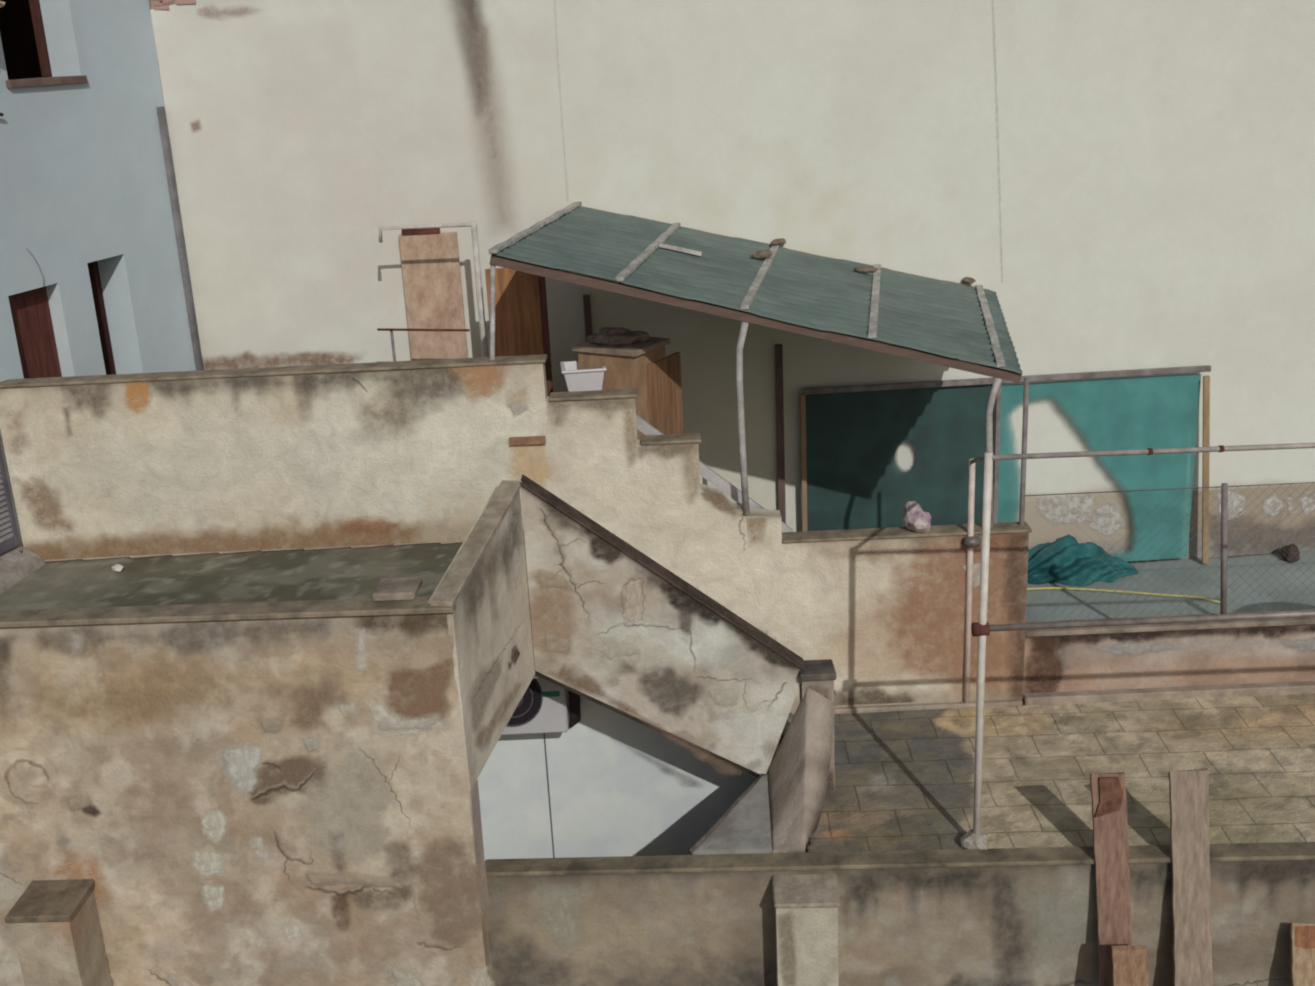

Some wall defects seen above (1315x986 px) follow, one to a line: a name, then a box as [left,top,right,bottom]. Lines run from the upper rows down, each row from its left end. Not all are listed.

spalling [153,0,196,10]
water stain [461,0,492,122]
peeling [1089,504,1125,536]
peeling [1216,490,1246,520]
peeling [1261,491,1315,516]
crack [541,509,590,618]
spalling [224,737,324,804]
crack [274,831,411,915]
water stain [896,872,1024,986]